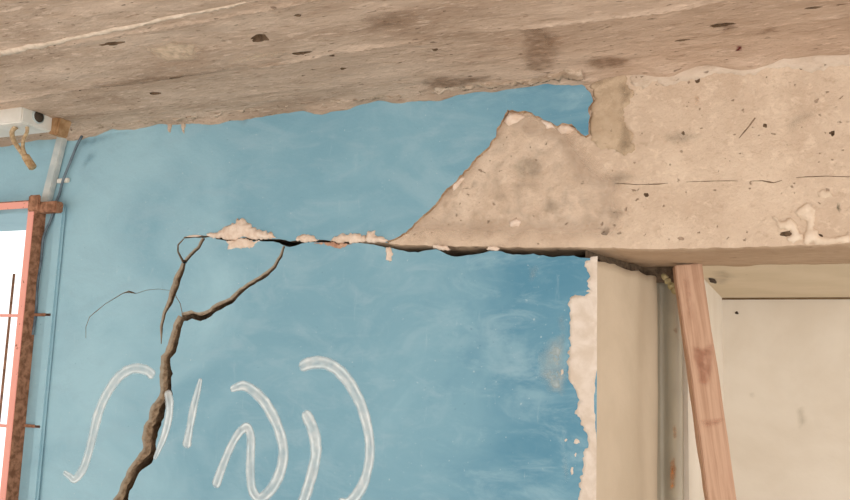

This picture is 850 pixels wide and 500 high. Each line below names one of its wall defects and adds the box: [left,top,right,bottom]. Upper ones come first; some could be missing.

spalling [387,89,615,243]
crack [610,180,667,188]
crack [758,175,850,183]
spalling [187,218,276,249]
crack [433,244,500,257]
spalling [772,203,850,245]
crack [86,231,393,500]
peeling [561,256,598,500]